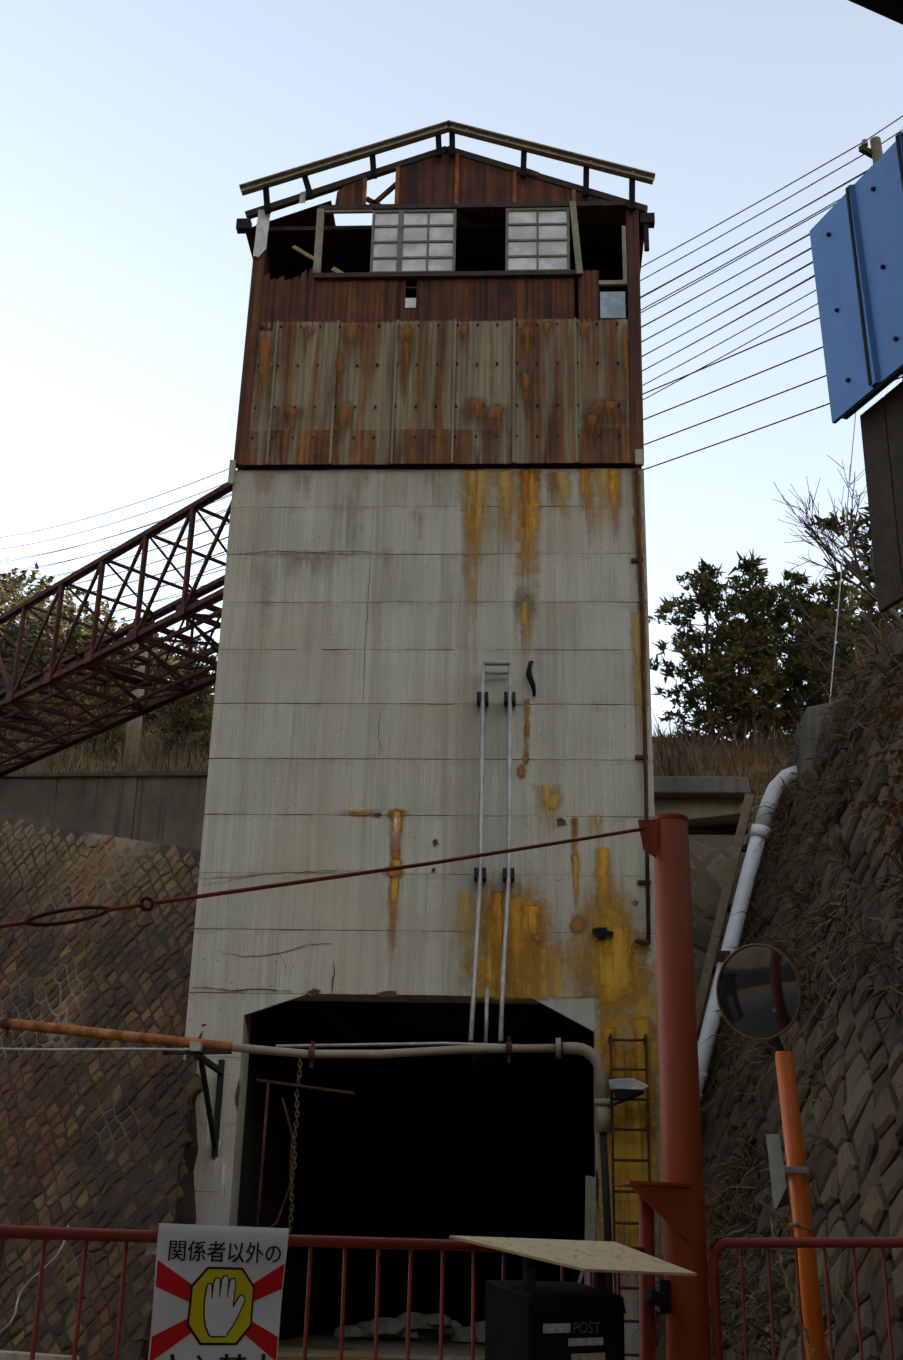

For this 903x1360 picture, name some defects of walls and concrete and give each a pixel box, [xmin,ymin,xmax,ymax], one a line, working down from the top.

rust [399,325,413,397]
rust [465,469,646,725]
rust [517,699,530,778]
rust [344,809,406,928]
rust [571,817,580,902]